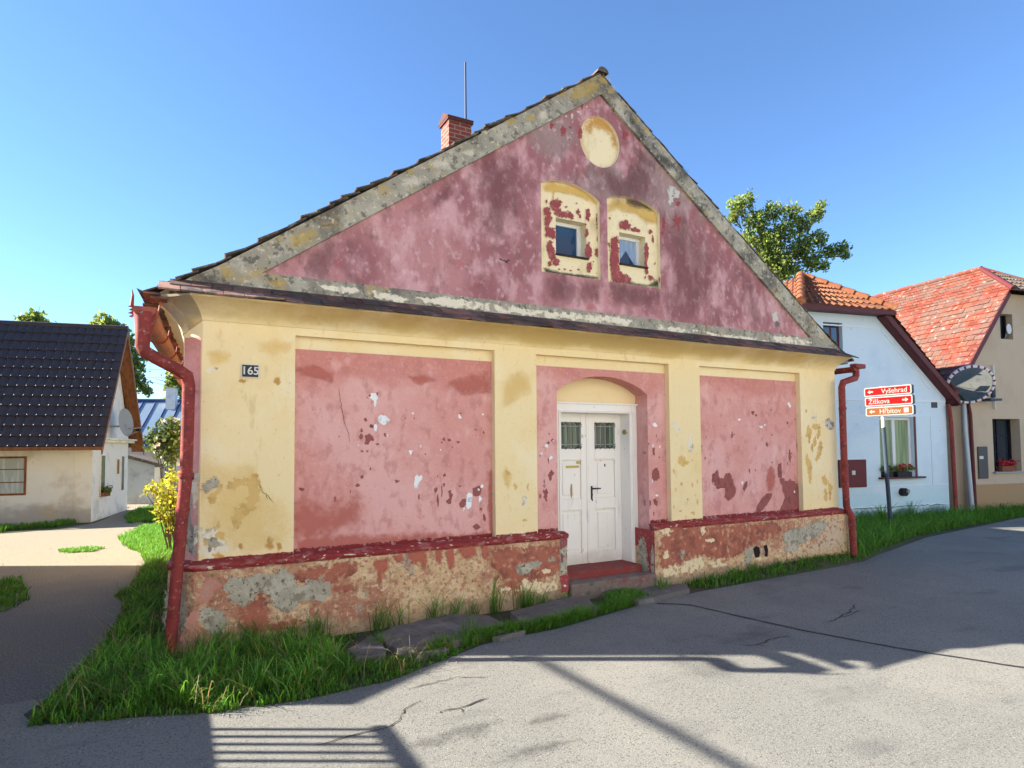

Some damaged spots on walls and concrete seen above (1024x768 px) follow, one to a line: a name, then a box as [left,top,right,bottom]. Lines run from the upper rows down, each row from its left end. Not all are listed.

peeling [543,186,681,283]
peeling [319,284,631,326]
peeling [358,393,390,453]
peeling [186,473,261,559]
peeling [434,473,486,530]
peeling [505,433,554,506]
peeling [635,392,845,579]
spalling [162,560,359,654]
crack [318,676,486,745]